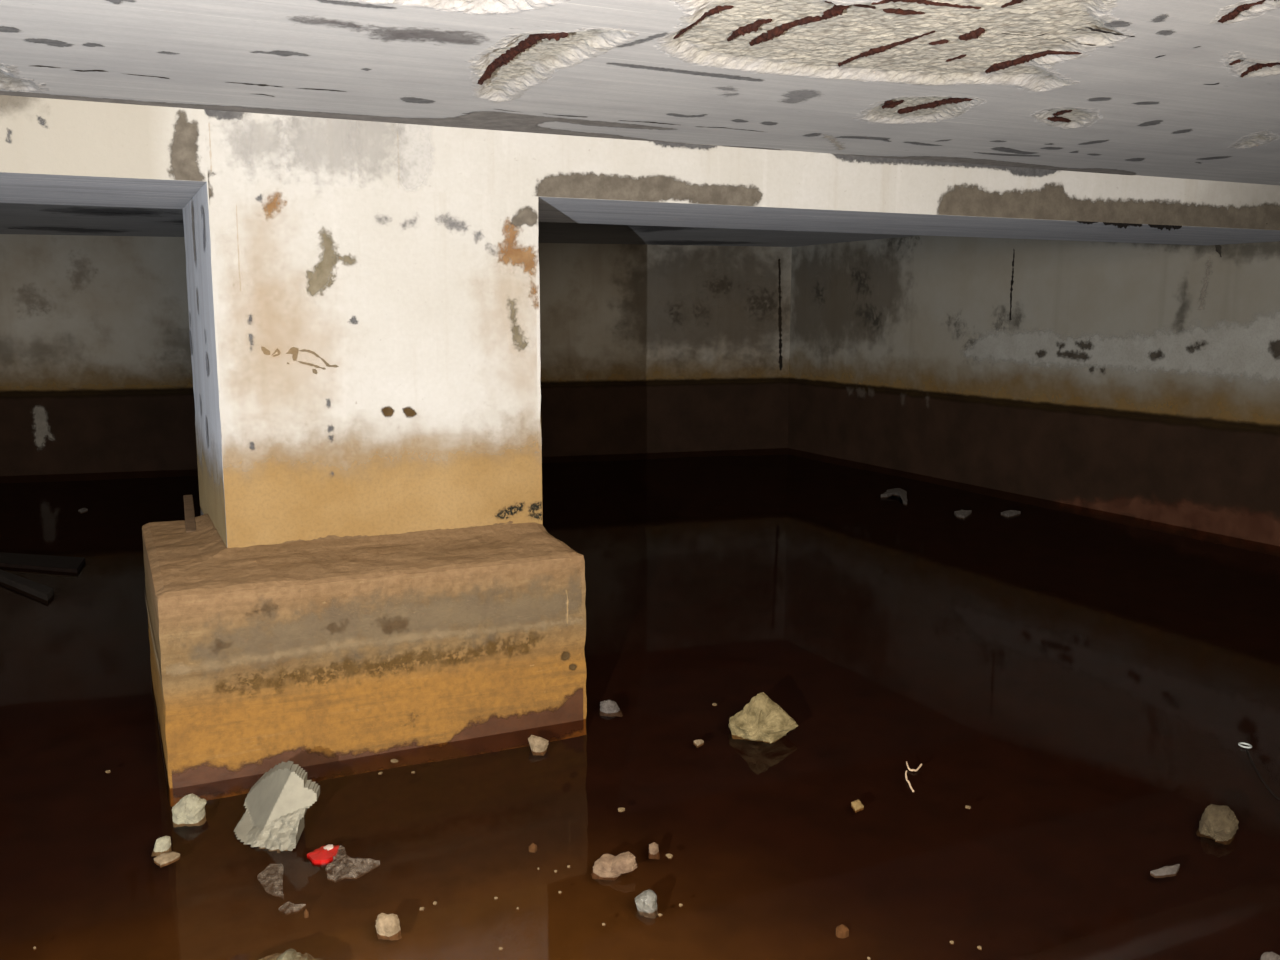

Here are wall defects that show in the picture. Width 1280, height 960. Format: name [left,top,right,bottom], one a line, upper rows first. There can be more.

spalling [0,0,1280,248]
corrosion [499,220,539,307]
water stain [1036,340,1105,372]
water stain [1269,340,1280,359]
water stain [0,364,1280,548]